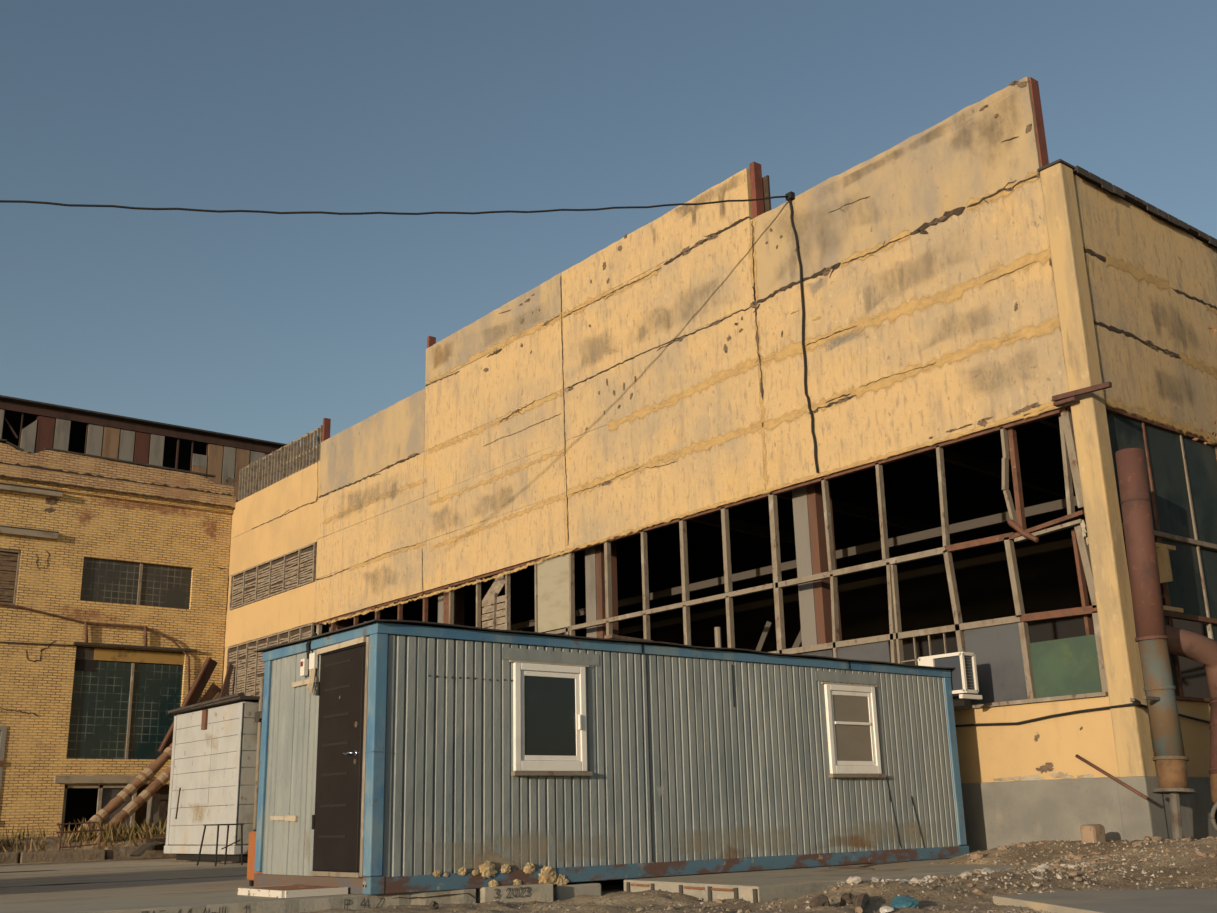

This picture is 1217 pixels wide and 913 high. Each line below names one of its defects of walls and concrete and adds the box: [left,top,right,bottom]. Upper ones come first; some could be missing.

crack [1084,249,1106,261]
crack [985,257,1052,283]
crack [484,170,1040,542]